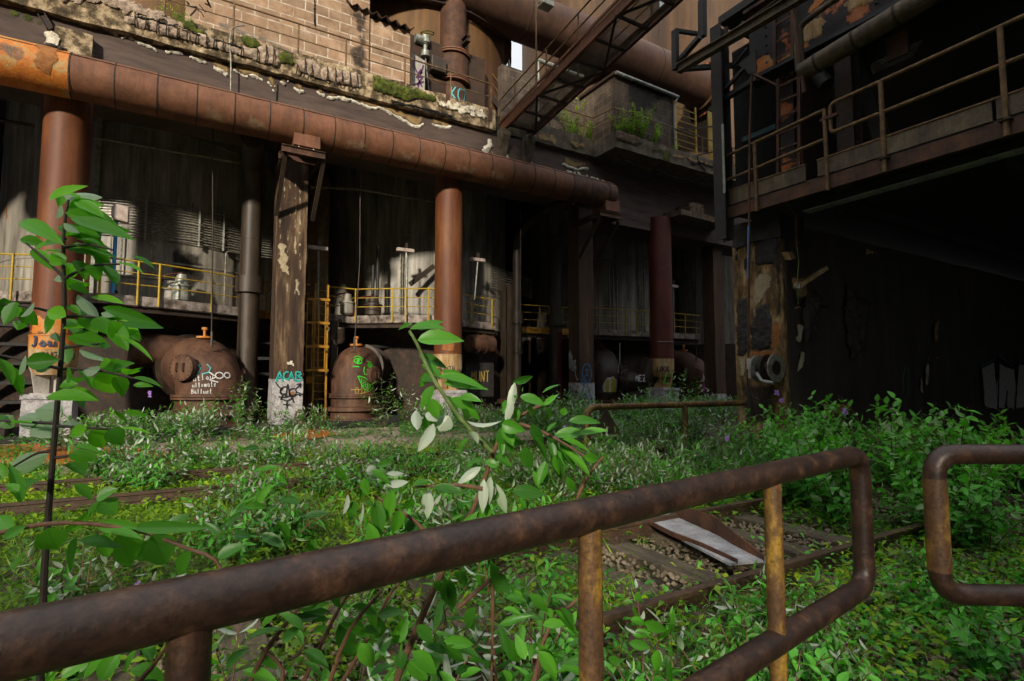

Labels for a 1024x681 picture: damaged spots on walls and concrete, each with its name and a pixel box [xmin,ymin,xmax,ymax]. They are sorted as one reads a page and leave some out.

rust [33,44,58,75]
peeling [278,243,300,295]
peeling [753,273,772,312]
rust [31,316,68,335]
rust [0,444,78,466]